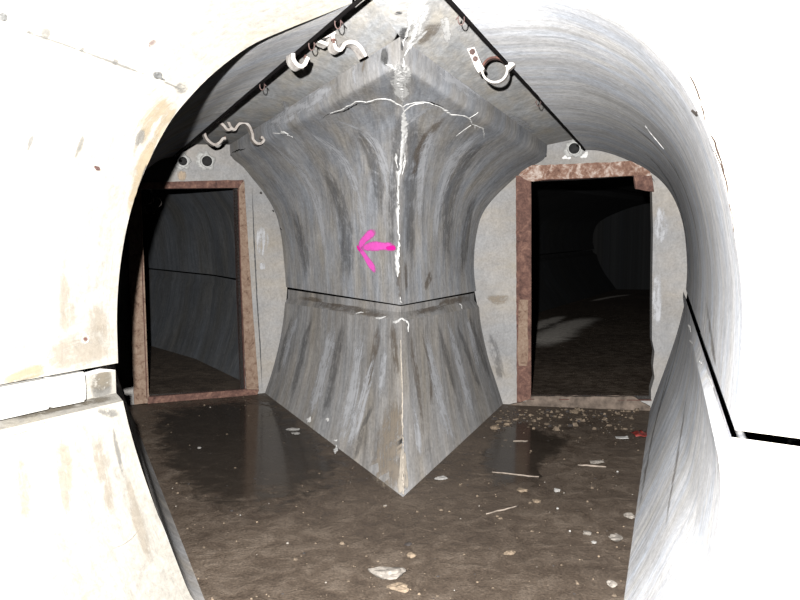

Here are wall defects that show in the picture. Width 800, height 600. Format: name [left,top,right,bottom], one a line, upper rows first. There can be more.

damp [441,18,451,42]
damp [272,88,331,137]
damp [346,0,430,277]
crack [323,98,485,136]
damp [314,136,366,232]